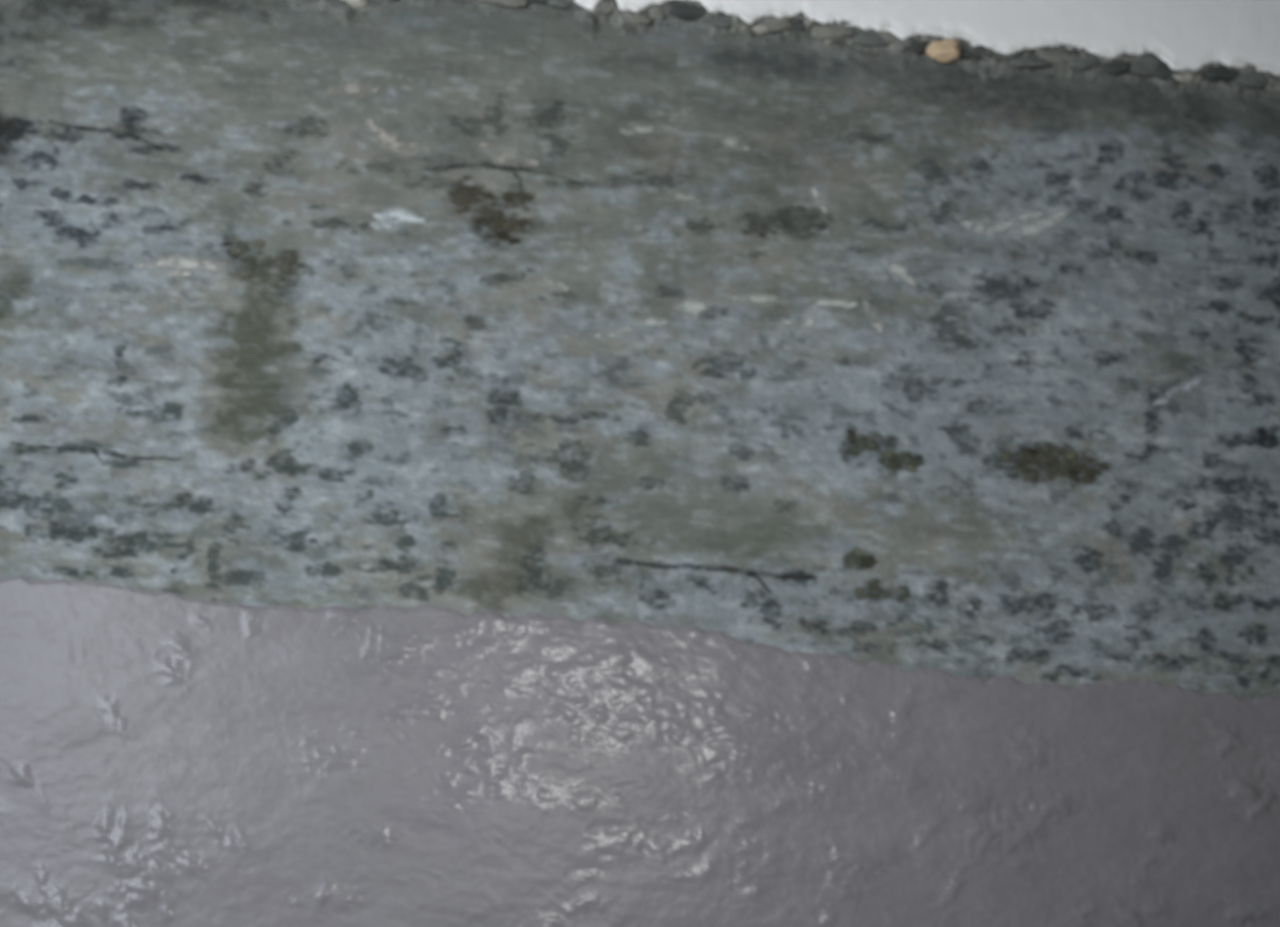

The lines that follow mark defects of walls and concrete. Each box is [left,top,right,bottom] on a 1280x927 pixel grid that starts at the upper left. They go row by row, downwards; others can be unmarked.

flaking render [283,0,1280,110]
peeling [40,189,116,247]
spalling [424,157,534,243]
damp [207,266,301,440]
peeling [0,467,191,577]
peeling [242,451,350,510]
peeling [372,511,456,600]
crack [636,562,815,591]
spalling [844,548,910,601]
spalling [844,429,923,472]
spalling [941,427,1109,484]
peeling [1107,426,1280,610]